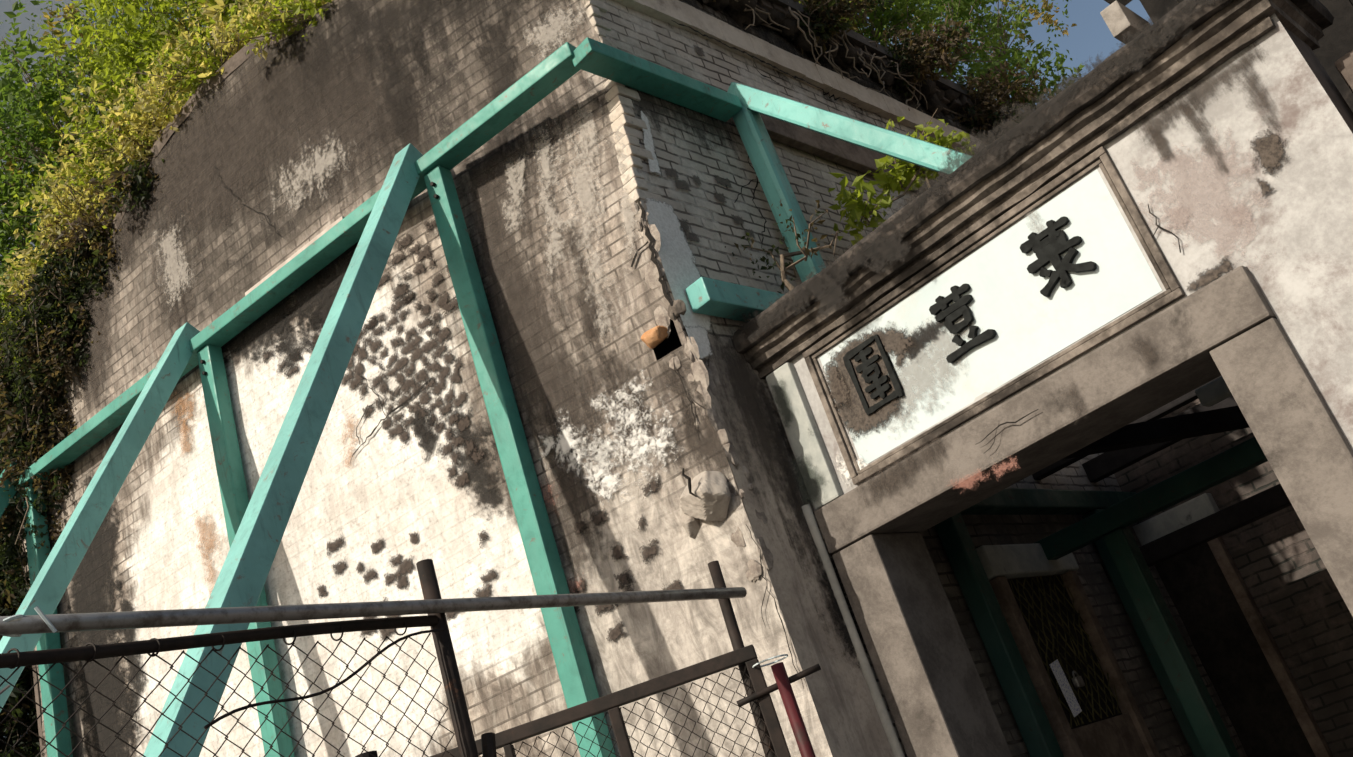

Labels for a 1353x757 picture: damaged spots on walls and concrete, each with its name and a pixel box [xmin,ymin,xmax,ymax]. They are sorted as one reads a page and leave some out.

damp [1144,45,1278,172]
damp [82,0,571,410]
peeling [504,111,611,335]
flaking render [616,111,755,238]
spalling [621,189,753,500]
damp [460,0,1214,665]
damp [410,402,504,520]
peeling [538,373,675,537]
flaking render [571,515,659,643]
flaking render [663,580,683,590]
spalling [731,509,774,582]